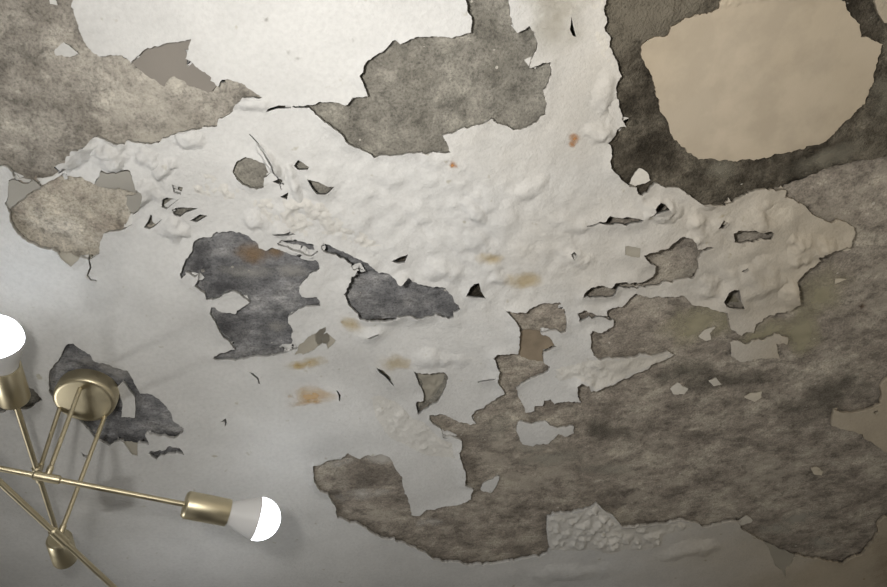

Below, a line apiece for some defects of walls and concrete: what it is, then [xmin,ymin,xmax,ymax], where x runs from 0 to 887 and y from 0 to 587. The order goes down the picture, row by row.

peeling [0,0,260,274]
peeling [181,231,335,359]
peeling [300,0,887,575]
peeling [24,388,41,407]
peeling [50,344,184,455]